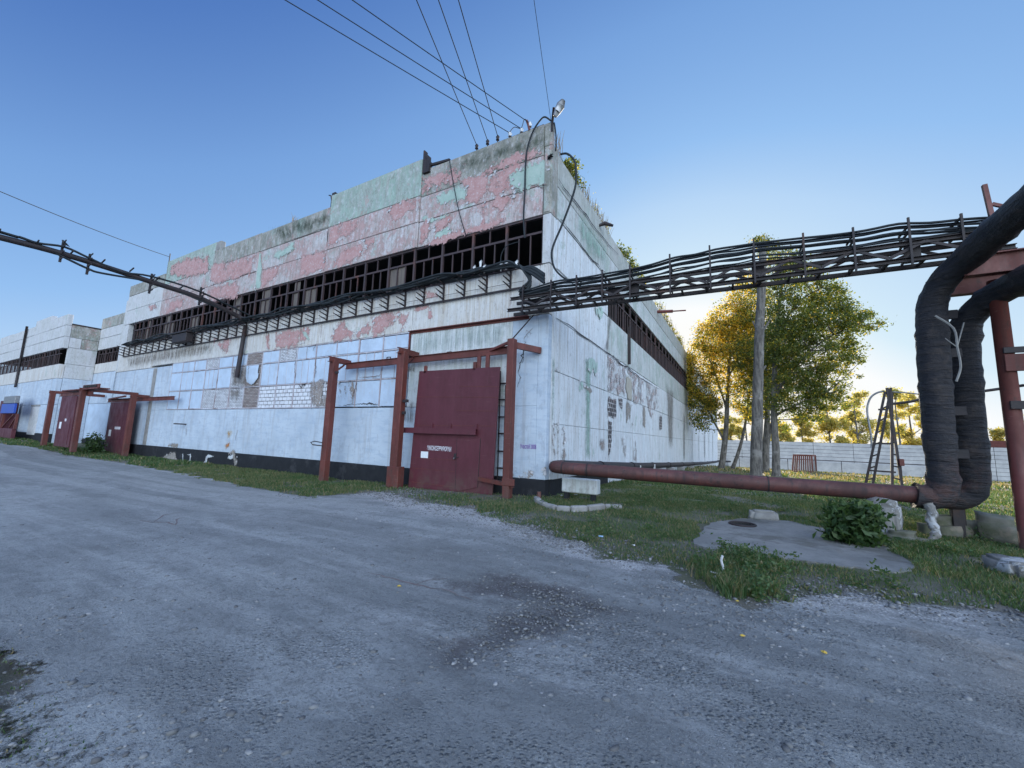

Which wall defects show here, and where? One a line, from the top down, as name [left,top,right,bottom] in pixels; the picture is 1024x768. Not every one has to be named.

peeling [387,148,550,246]
peeling [169,217,375,301]
peeling [265,327,310,349]
flaking render [579,356,662,461]